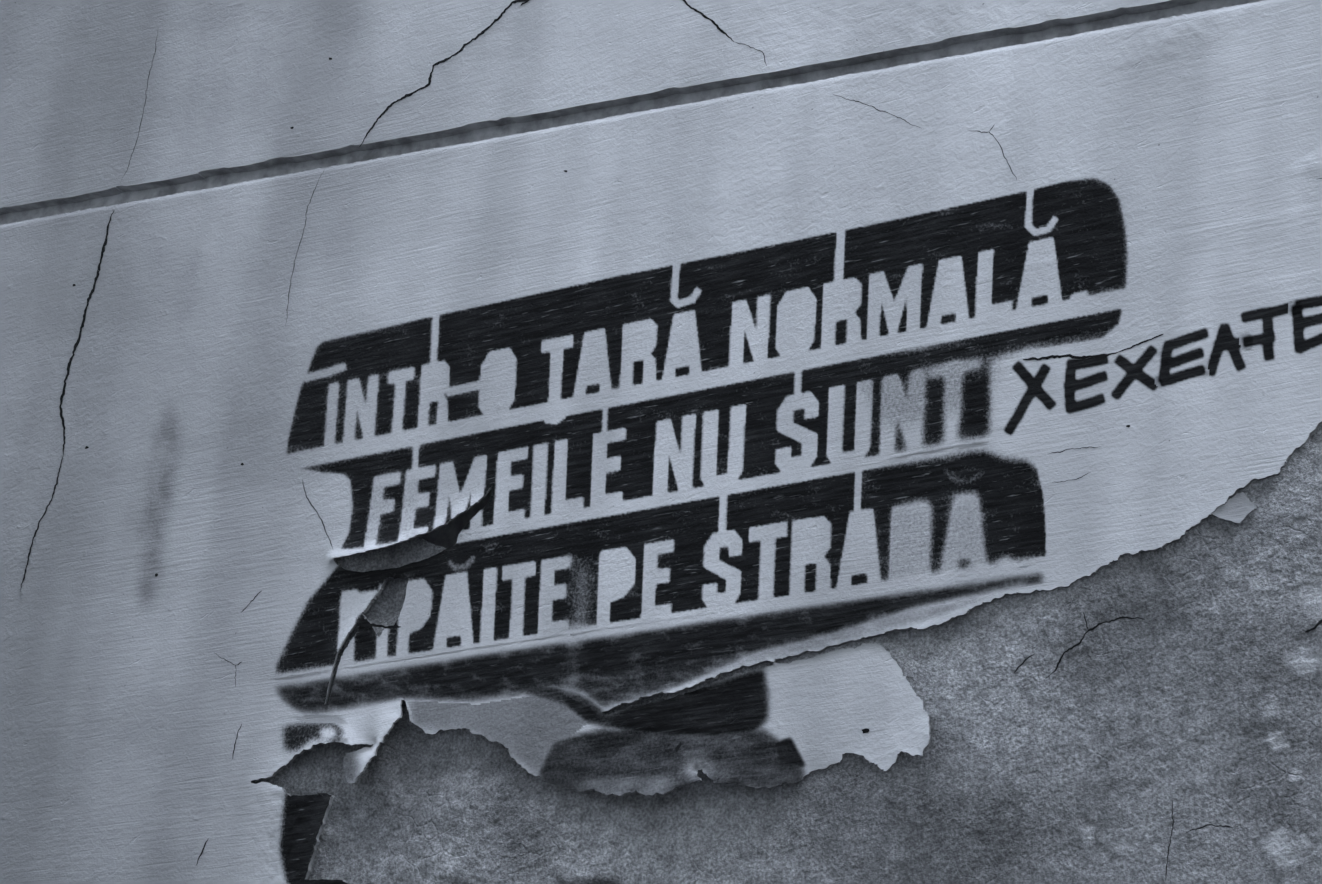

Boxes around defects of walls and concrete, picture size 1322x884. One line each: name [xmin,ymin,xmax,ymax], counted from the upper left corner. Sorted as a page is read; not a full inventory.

crack [359,0,529,147]
crack [683,0,767,66]
crack [20,35,158,591]
crack [286,171,324,322]
spalling [254,424,1322,884]